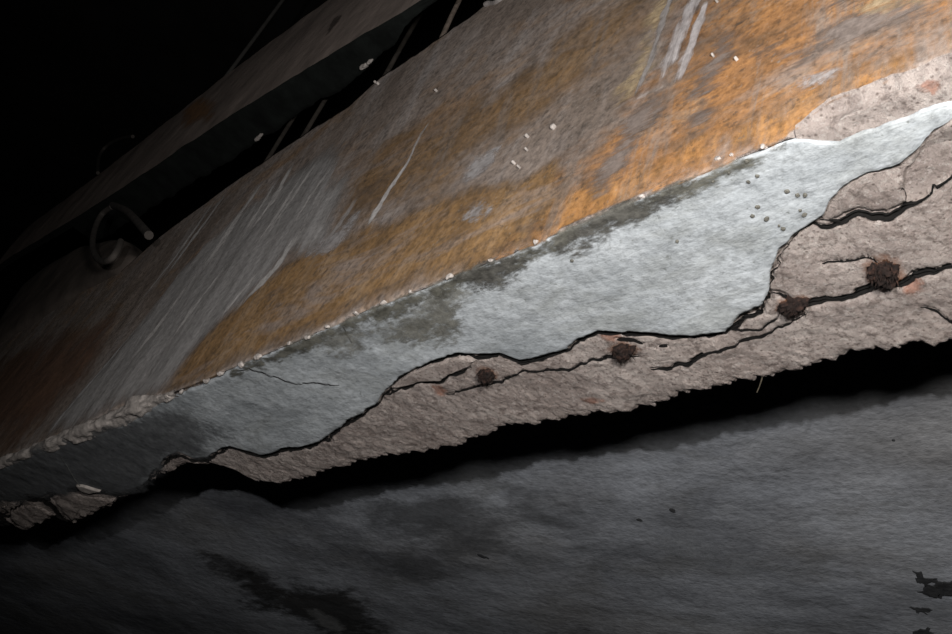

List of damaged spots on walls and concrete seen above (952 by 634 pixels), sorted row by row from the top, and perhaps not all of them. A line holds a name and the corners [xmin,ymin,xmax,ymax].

peeling [0,53,952,530]
crack [0,175,952,526]
rust [168,0,952,390]
damp [617,0,707,99]